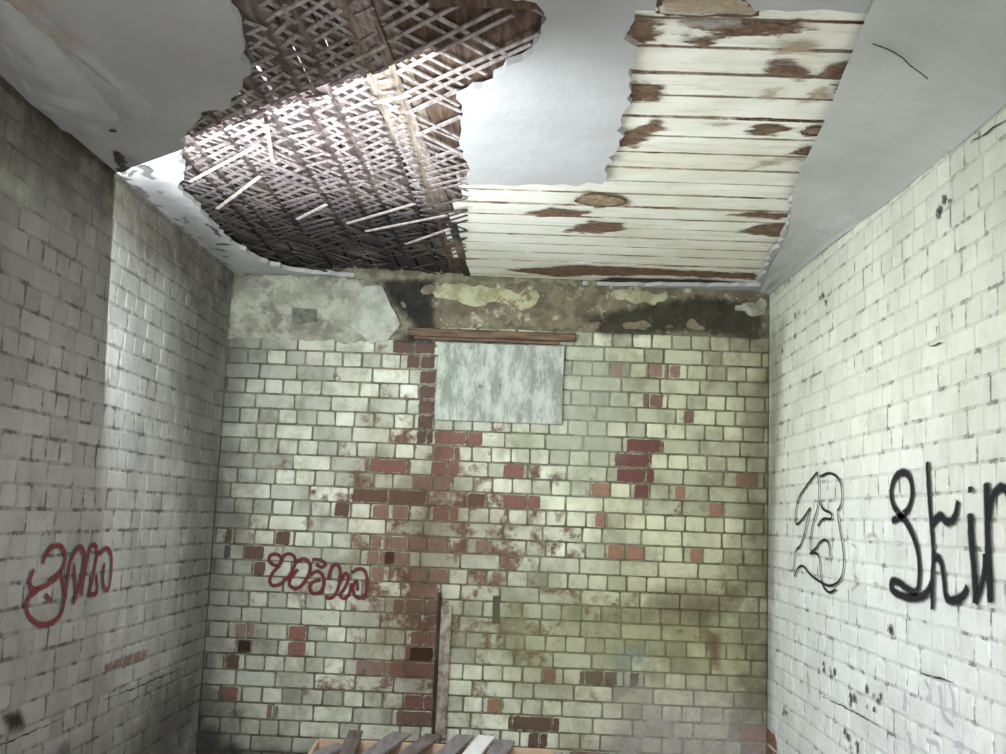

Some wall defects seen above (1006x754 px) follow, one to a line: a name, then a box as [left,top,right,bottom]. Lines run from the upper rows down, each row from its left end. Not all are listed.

peeling [627,0,847,103]
crack [873,43,928,80]
peeling [619,120,670,151]
peeling [744,124,821,169]
leakage [0,75,226,288]
peeling [527,191,631,234]
peeling [727,211,788,237]
leakage [590,297,759,338]
crack [0,718,63,745]
flaking render [766,728,777,754]